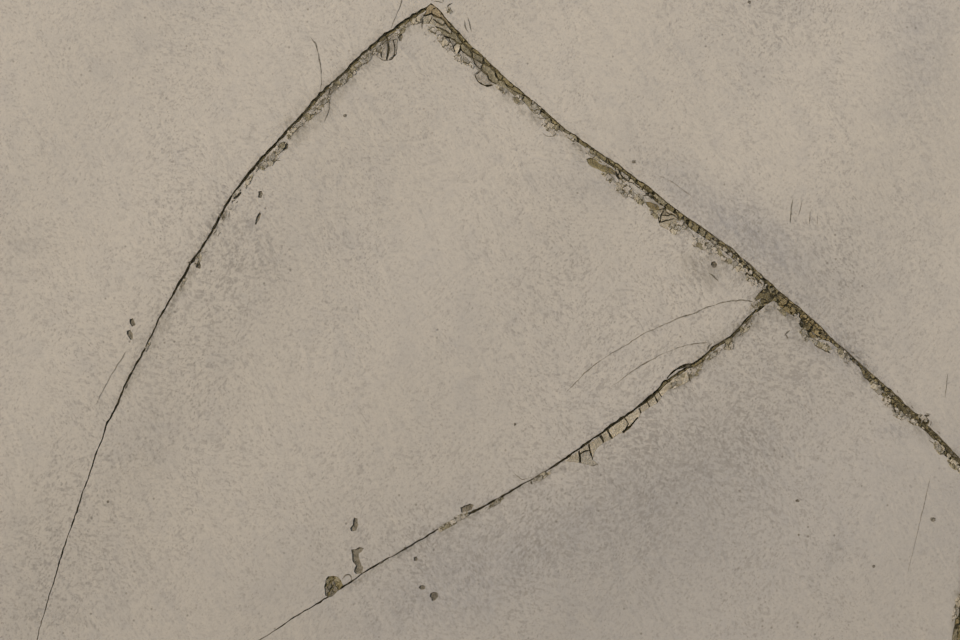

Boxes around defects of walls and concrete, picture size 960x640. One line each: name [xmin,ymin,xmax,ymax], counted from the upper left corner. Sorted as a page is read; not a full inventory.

crack [89,329,155,476]
crack [259,295,776,640]
crack [156,4,960,473]
crack [952,594,960,640]